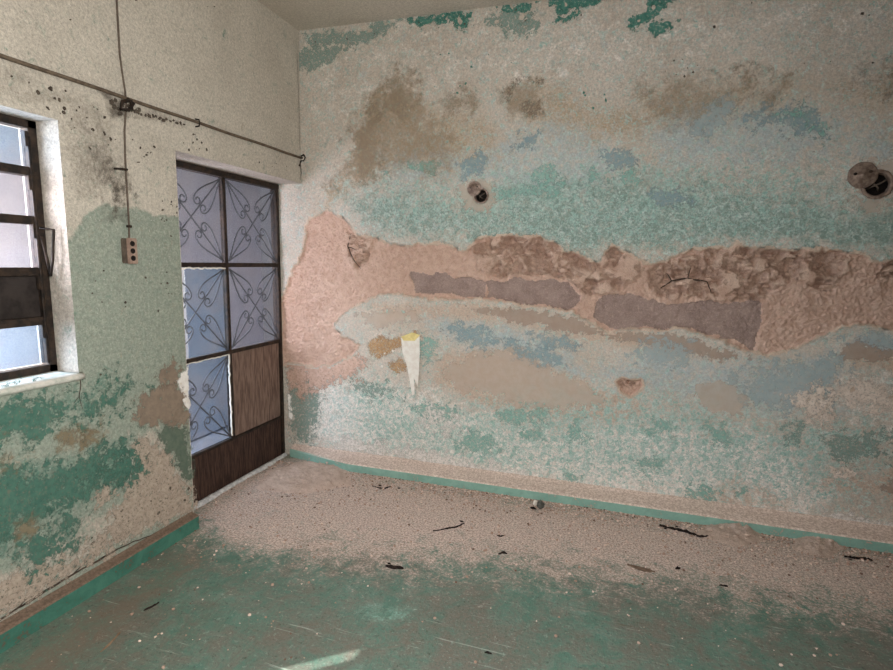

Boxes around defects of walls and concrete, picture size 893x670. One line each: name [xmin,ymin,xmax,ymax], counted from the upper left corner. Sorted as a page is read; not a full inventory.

peeling [0,361,199,621]
spalling [281,209,893,457]
peeling [817,420,893,470]